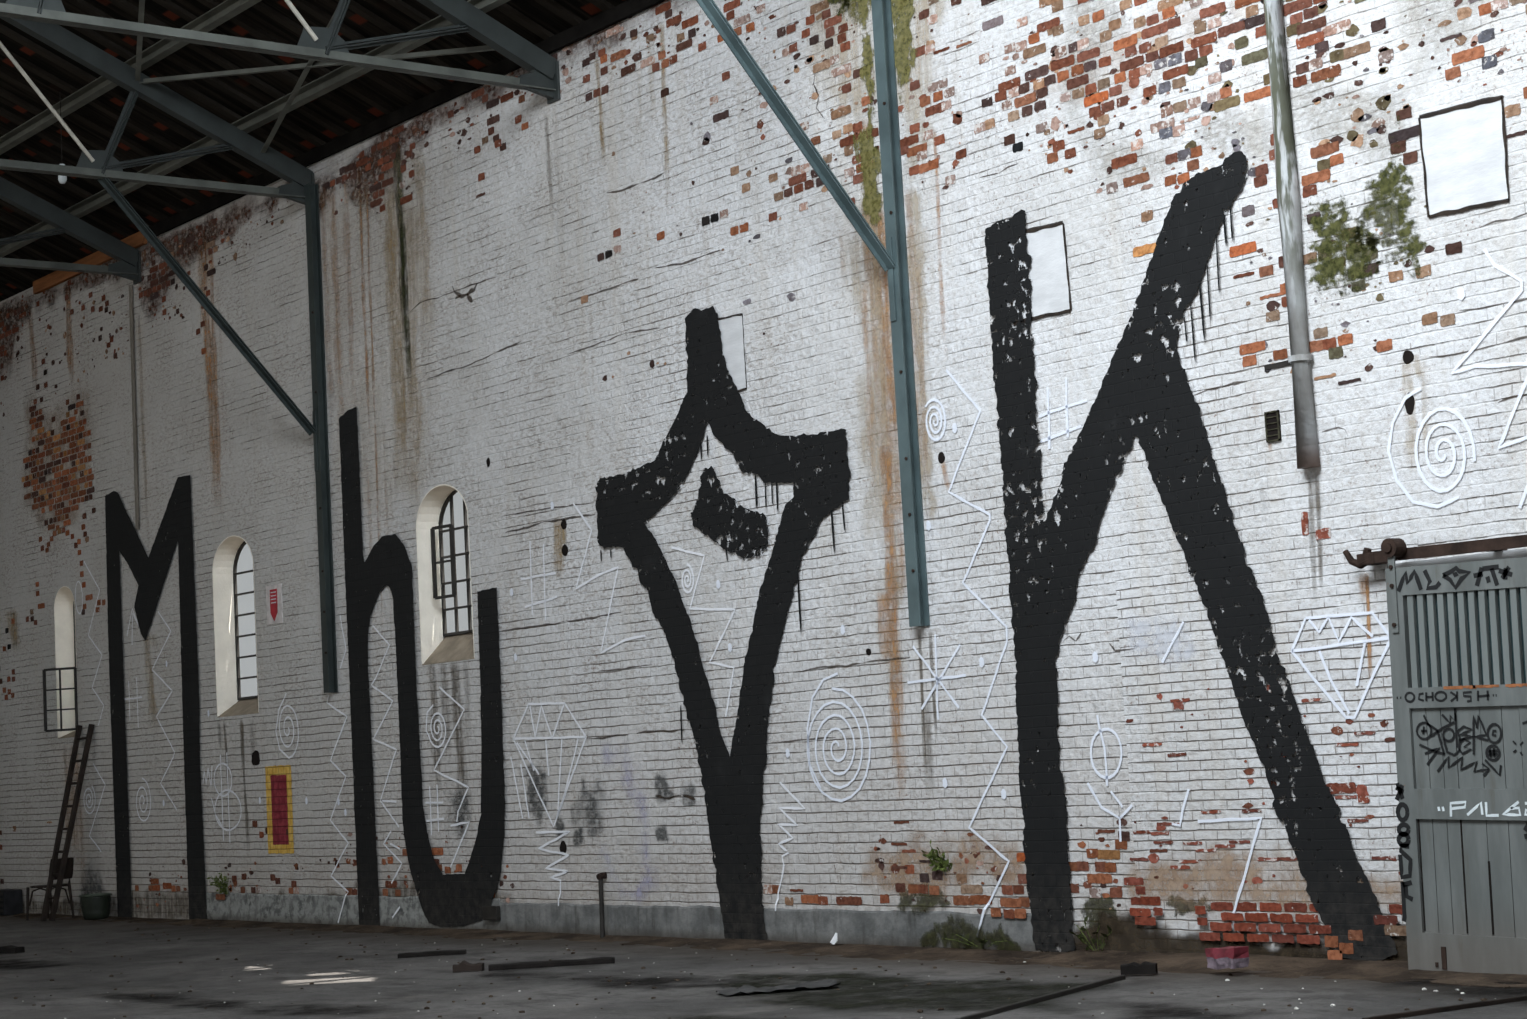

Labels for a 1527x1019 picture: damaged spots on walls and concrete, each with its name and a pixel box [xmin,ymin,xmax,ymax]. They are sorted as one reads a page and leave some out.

peeling [551,0,879,251]
peeling [898,0,1287,322]
peeling [1283,0,1527,224]
peeling [0,201,288,615]
rust [200,240,219,456]
rust [858,216,895,429]
peeling [1239,340,1292,373]
peeling [1303,203,1462,385]
rust [863,442,900,741]
peeling [874,821,1030,919]
peeling [1068,816,1406,960]
peeling [1326,713,1395,827]